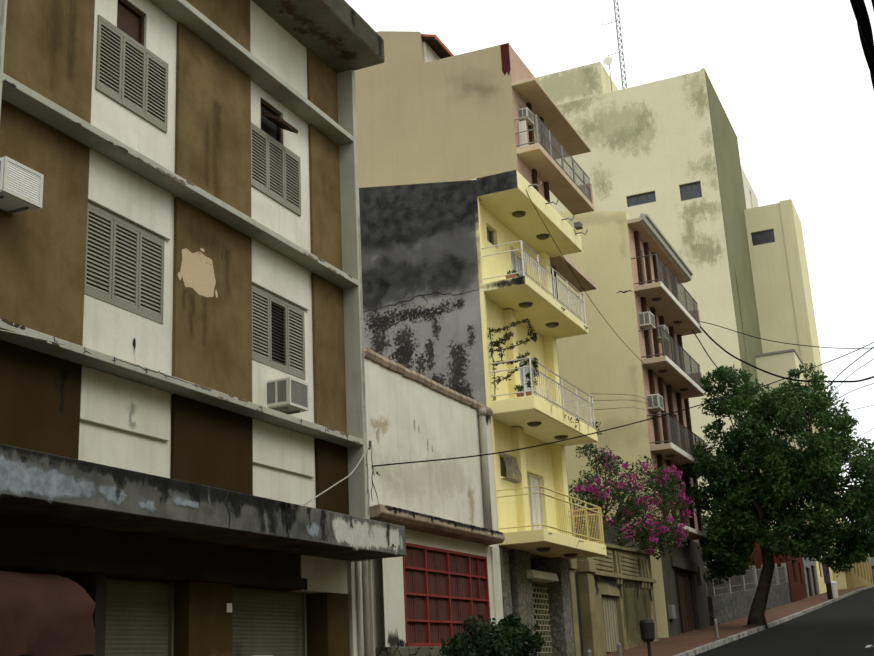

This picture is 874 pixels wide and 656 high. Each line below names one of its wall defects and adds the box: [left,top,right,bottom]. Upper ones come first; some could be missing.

water stain [321,0,385,62]
water stain [359,170,518,308]
peeling [178,248,218,298]
crack [363,289,476,313]
water stain [0,444,328,539]